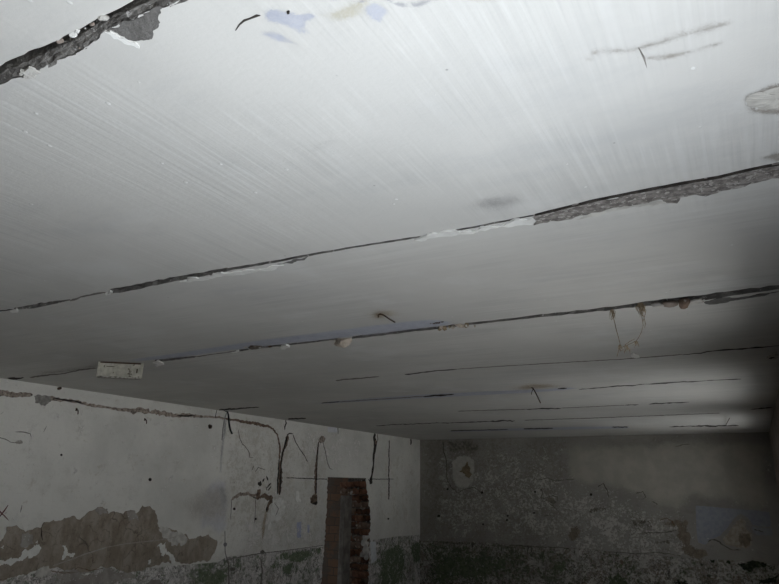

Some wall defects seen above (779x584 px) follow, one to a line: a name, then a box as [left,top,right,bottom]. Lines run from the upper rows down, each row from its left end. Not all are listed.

spalling [0,0,188,83]
damp [235,0,437,44]
spalling [533,162,779,225]
crack [70,292,106,301]
crack [8,368,96,380]
crack [405,345,779,375]
crack [368,379,739,484]
flaking render [0,506,217,582]
peeling [726,560,766,572]